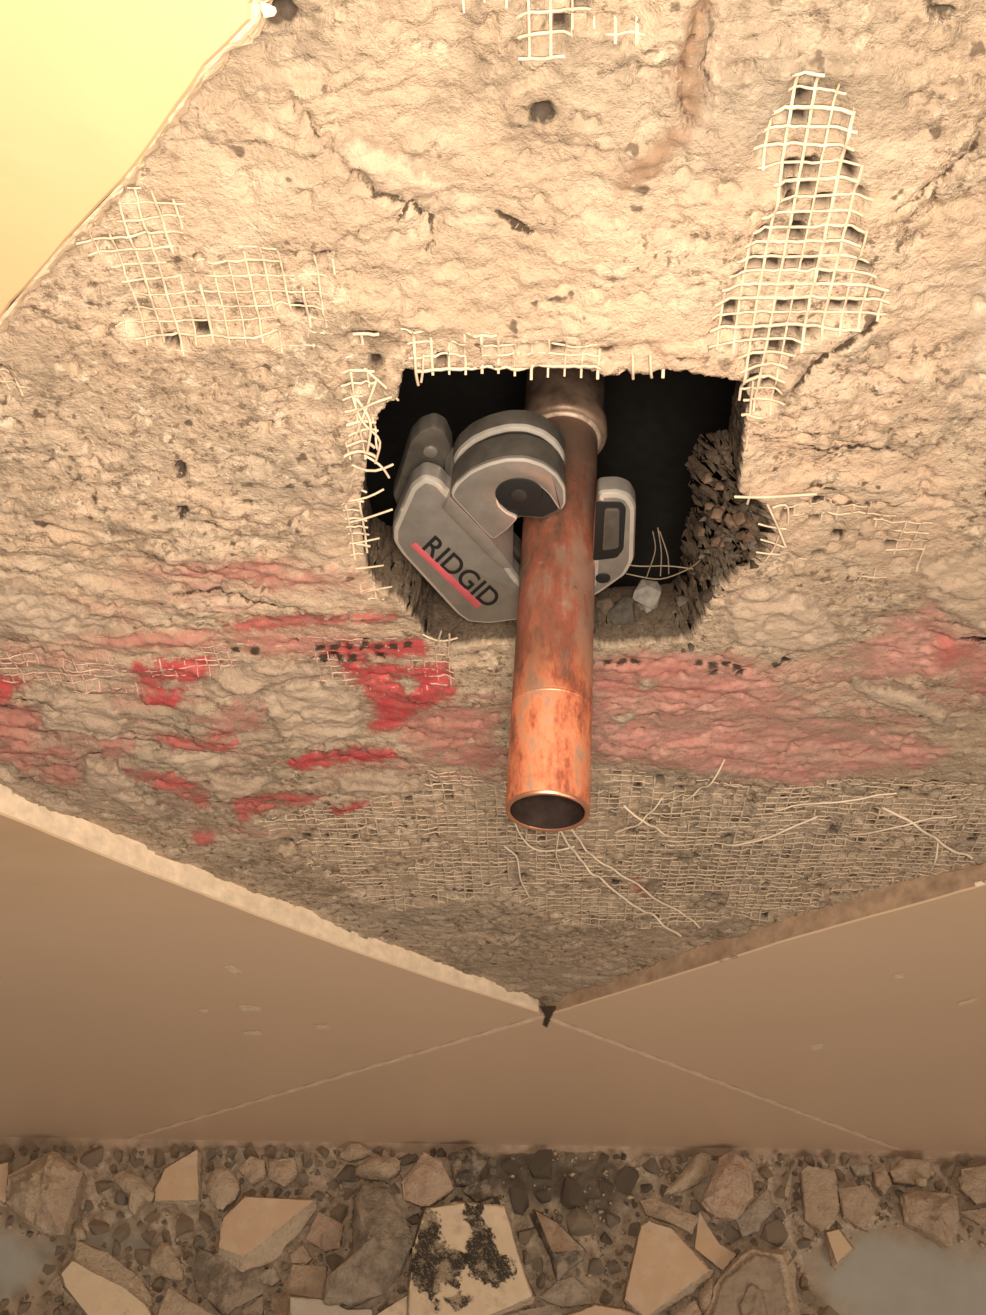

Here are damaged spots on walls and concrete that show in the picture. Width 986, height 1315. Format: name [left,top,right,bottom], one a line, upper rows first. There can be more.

spalling [0,0,298,333]
crack [895,133,980,211]
crack [790,321,877,396]
spalling [660,472,759,624]